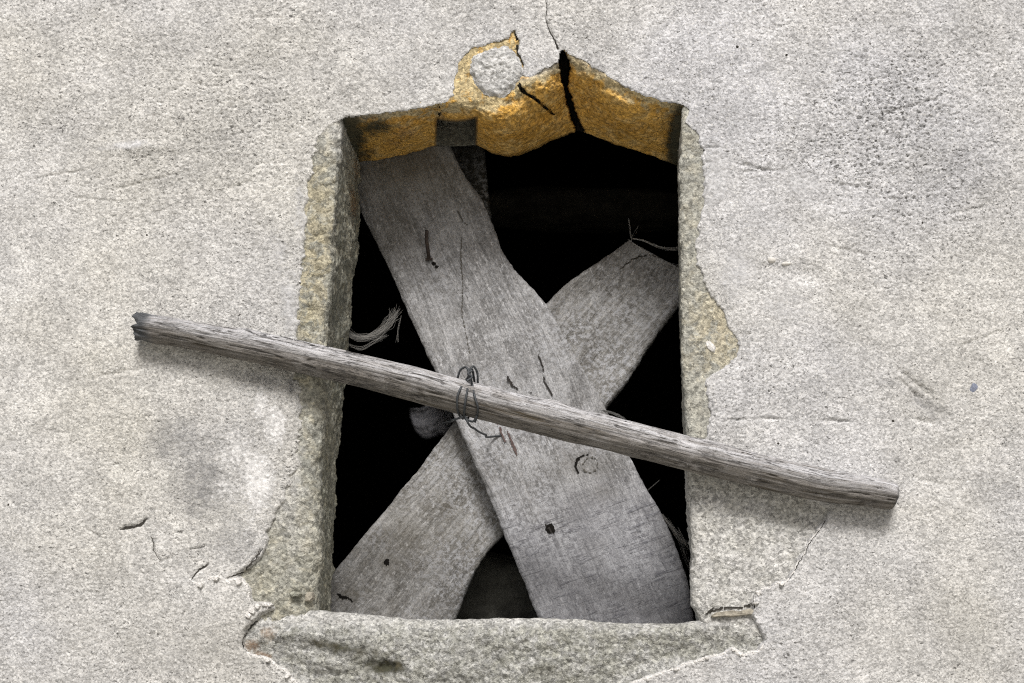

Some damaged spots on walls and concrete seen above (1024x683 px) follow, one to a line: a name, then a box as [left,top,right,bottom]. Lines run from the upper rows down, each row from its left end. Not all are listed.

spalling [447,30,559,103]
crack [514,2,585,132]
peeling [297,121,339,345]
peeling [681,106,738,439]
crack [120,518,159,559]
crack [190,546,263,580]
leakage [211,387,287,542]
peeling [192,372,321,623]
peeling [246,652,298,683]